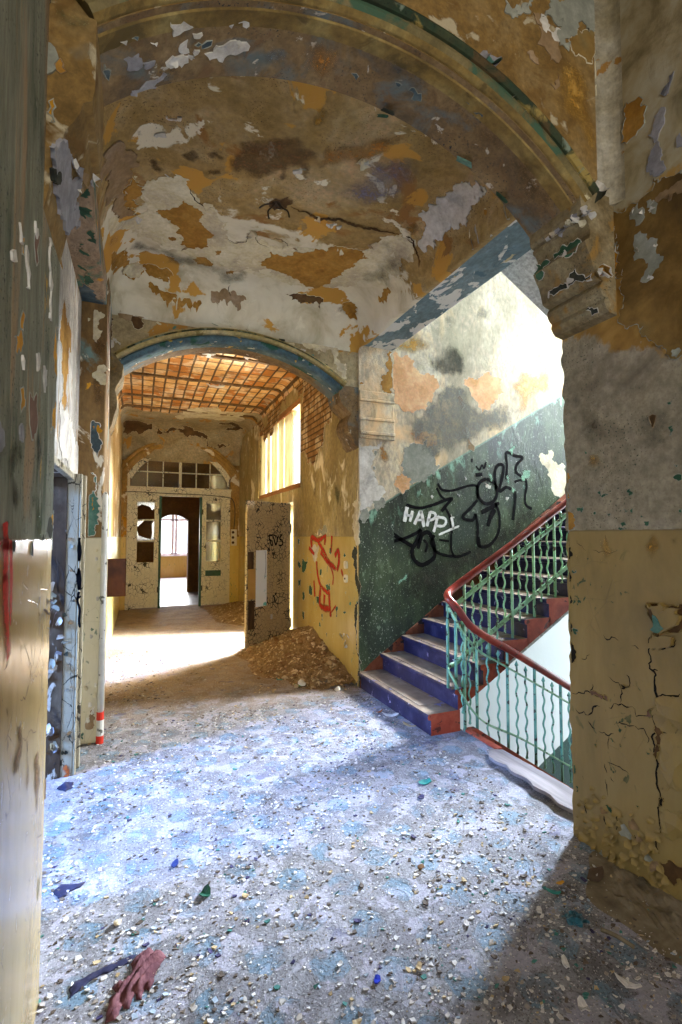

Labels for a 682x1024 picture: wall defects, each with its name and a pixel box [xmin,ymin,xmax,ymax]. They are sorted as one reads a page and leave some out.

peeling [121,21,250,97]
peeling [480,50,504,67]
damp [183,139,315,179]
peeling [49,138,510,348]
crack [292,207,421,265]
spalling [534,71,682,360]
peeling [92,365,109,385]
flaking render [122,380,332,467]
spalling [380,350,440,413]
spalling [457,371,504,414]
peeling [645,602,682,640]
crack [573,636,680,850]